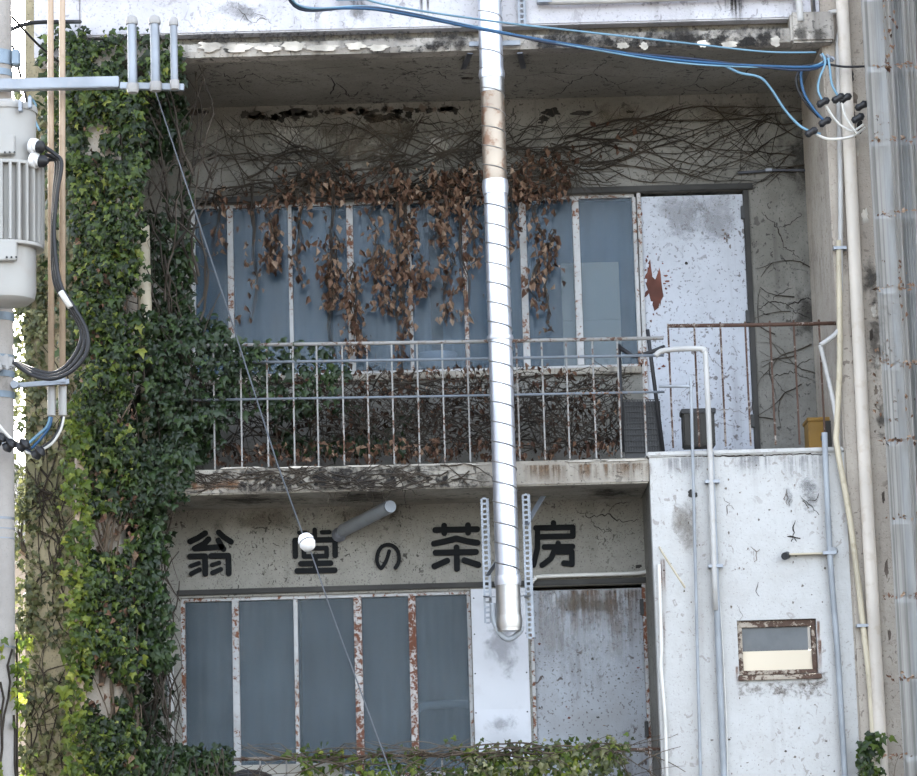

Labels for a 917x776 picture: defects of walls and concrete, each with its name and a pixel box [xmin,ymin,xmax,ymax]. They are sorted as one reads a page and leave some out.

spalling [240,104,460,141]
crack [762,213,802,258]
crack [759,288,811,316]
crack [576,502,638,532]
damp [541,590,637,641]